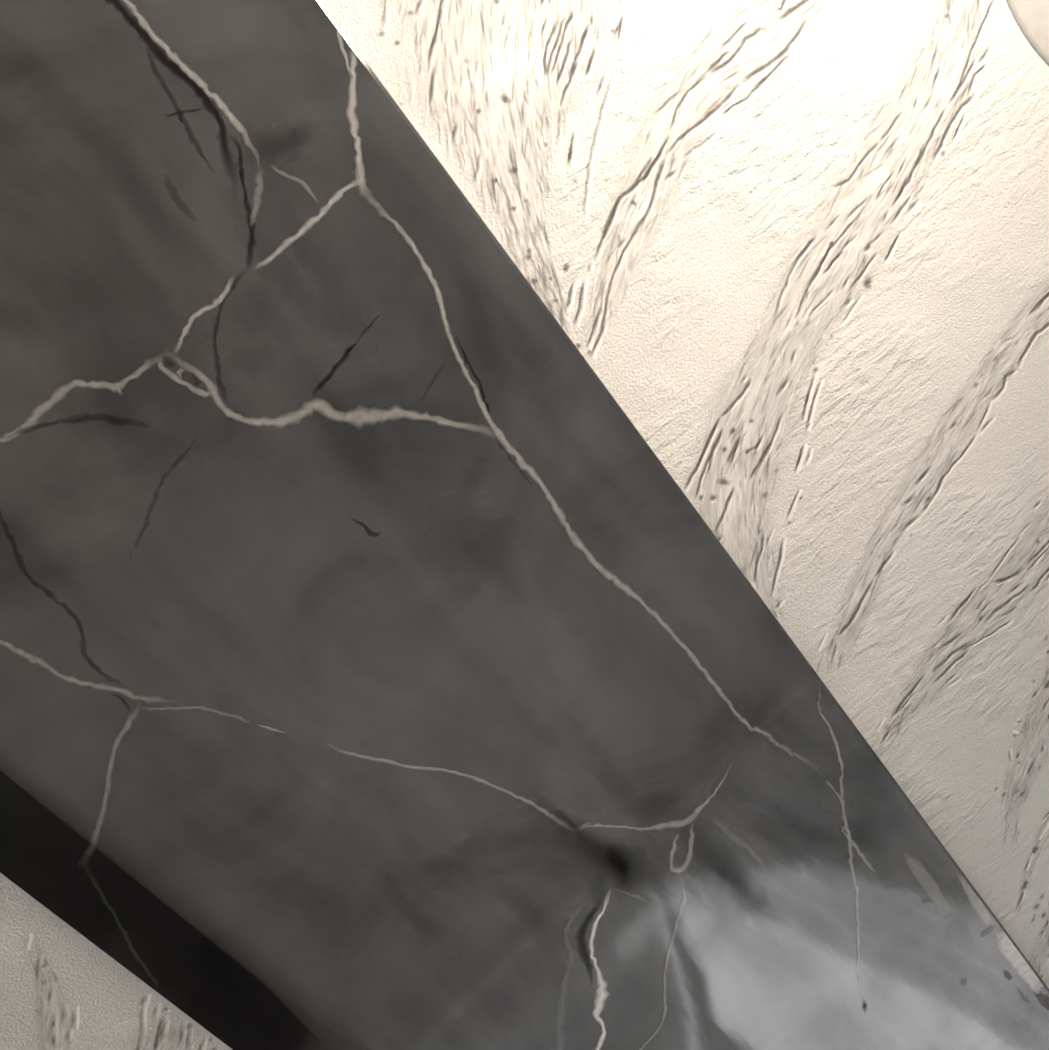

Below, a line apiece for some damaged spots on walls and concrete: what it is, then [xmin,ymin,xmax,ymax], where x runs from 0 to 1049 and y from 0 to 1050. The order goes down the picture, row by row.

crack [111,0,349,260]
crack [351,61,360,163]
crack [316,345,355,412]
crack [604,790,717,872]
crack [579,908,606,1050]